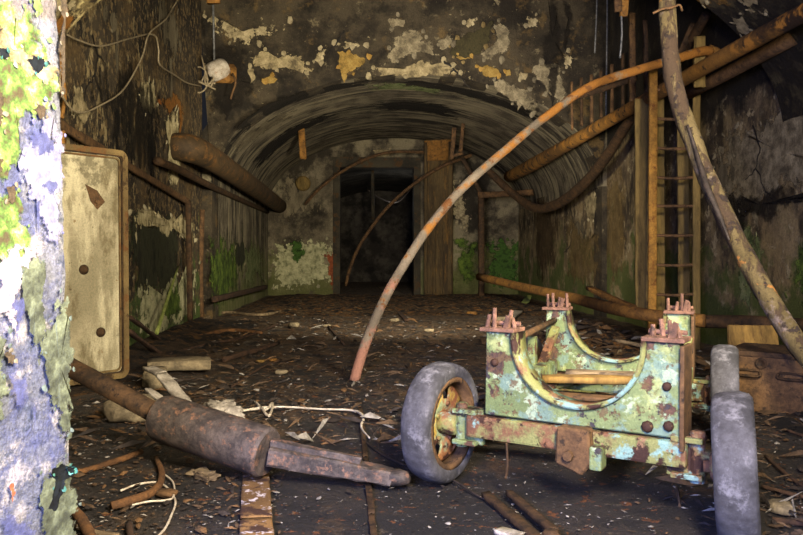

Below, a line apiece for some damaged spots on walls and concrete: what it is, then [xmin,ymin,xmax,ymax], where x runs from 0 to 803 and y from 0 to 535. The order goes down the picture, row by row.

peeling [139,76,159,116]
peeling [154,0,182,185]
flaking render [203,12,573,118]
peeling [729,0,768,37]
peeling [0,0,92,441]
peeling [264,237,333,292]